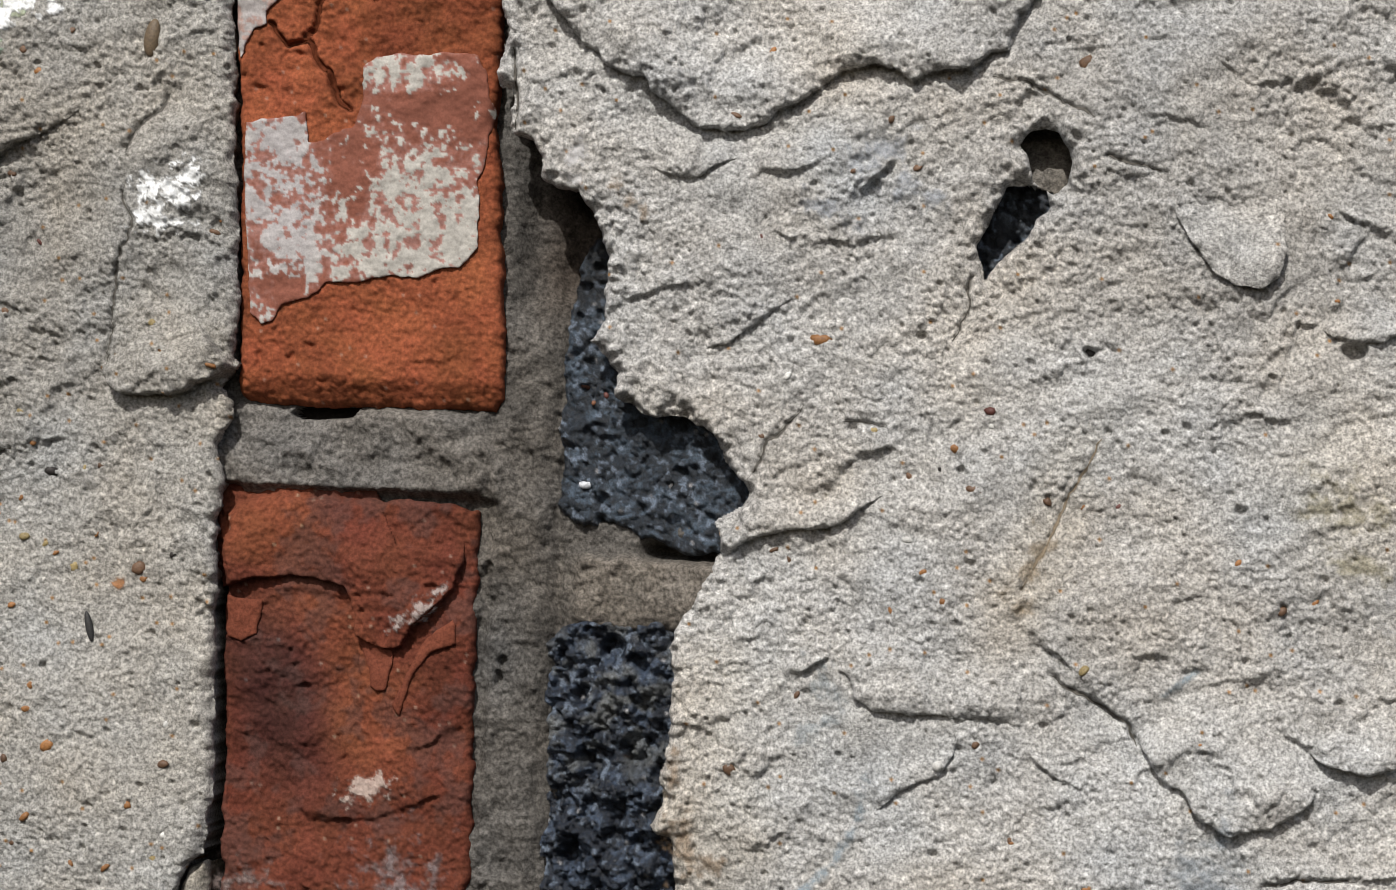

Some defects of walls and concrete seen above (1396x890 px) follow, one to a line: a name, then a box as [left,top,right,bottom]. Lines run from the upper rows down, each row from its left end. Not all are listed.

peeling [238,0,277,57]
flaking render [0,70,81,154]
peeling [244,52,497,324]
flaking render [699,271,794,348]
spalling [217,484,465,715]
crack [1050,675,1137,746]
crack [1260,879,1355,887]